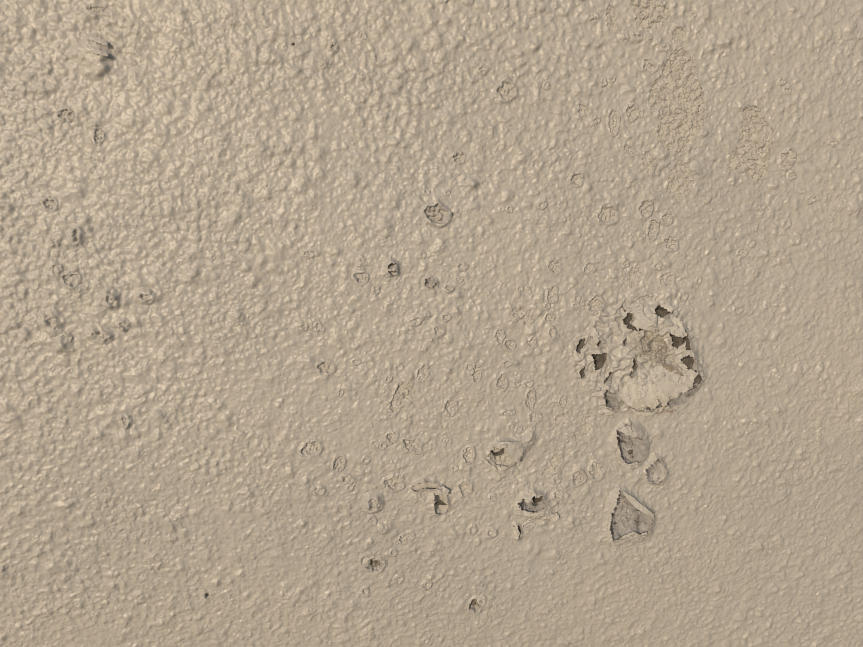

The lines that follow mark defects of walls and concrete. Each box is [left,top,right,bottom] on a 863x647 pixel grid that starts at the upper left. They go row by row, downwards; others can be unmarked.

peeling [629,0,686,53]
spalling [576,101,644,158]
peeling [724,104,797,184]
spalling [636,197,679,253]